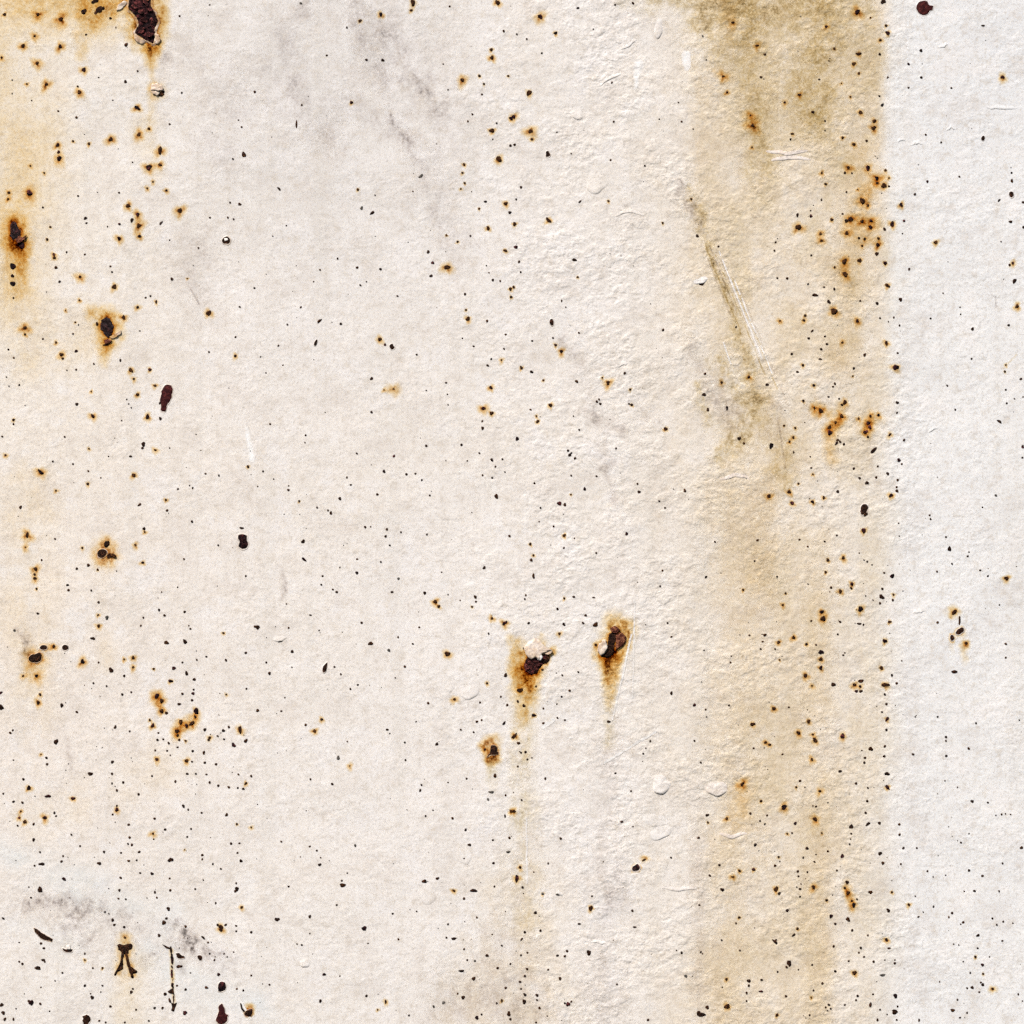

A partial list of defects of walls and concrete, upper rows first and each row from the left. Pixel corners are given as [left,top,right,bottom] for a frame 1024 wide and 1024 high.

rust [767,0,929,505]
rust [0,586,271,1024]
rust [460,666,579,767]
rust [696,512,1014,1022]